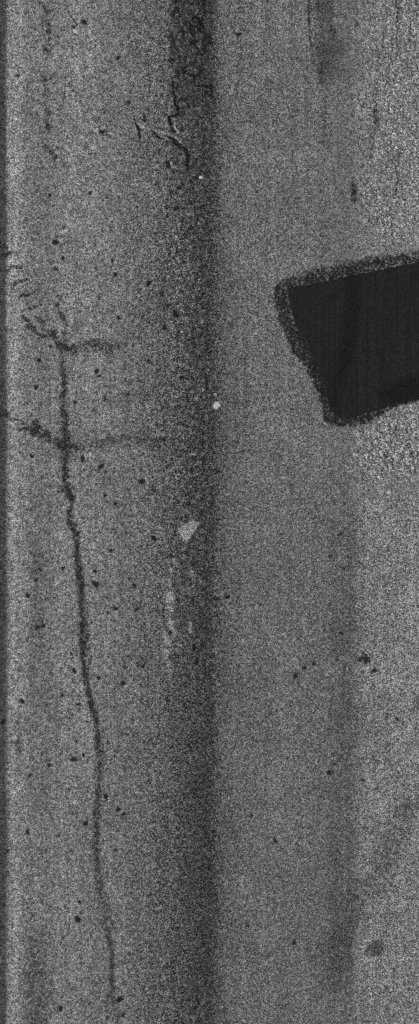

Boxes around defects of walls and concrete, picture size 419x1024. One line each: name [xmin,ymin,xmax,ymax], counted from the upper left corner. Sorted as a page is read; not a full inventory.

crack [134,81,190,170]
crack [0,244,146,889]